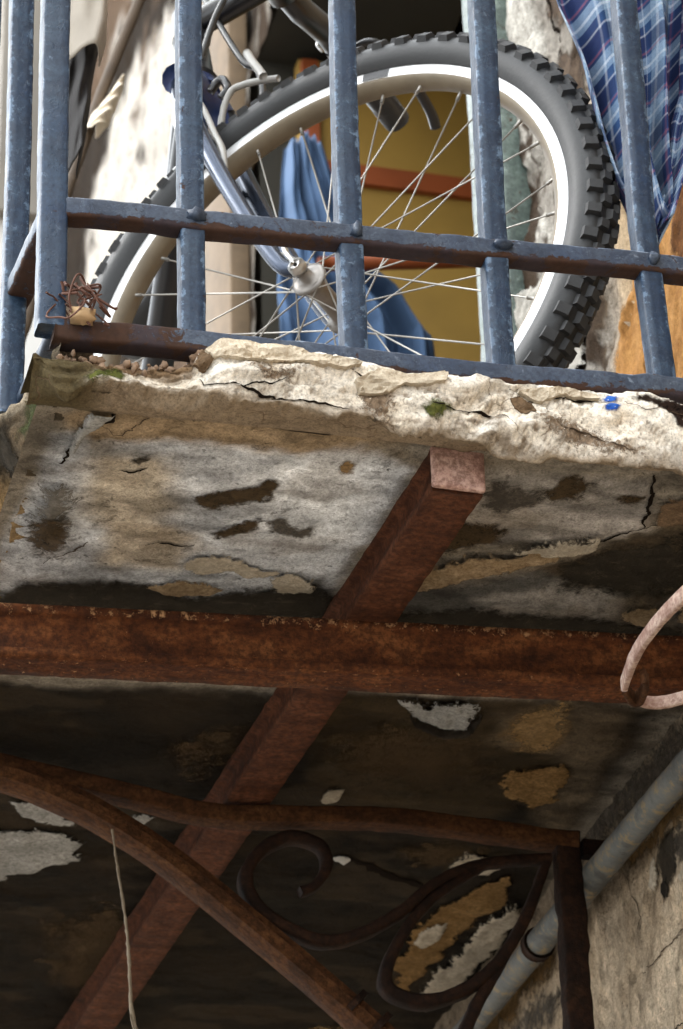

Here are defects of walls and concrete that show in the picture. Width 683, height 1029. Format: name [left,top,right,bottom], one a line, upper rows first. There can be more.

peeling [568,343,586,369]
crack [200,377,348,409]
peeling [192,338,449,421]
spalling [510,386,646,457]
water stain [195,480,279,511]
water stain [211,518,313,539]
water stain [445,475,598,553]
crack [588,475,658,546]
water stain [397,607,645,634]
spalling [397,698,483,739]
peeling [0,802,83,881]
crack [640,929,683,974]